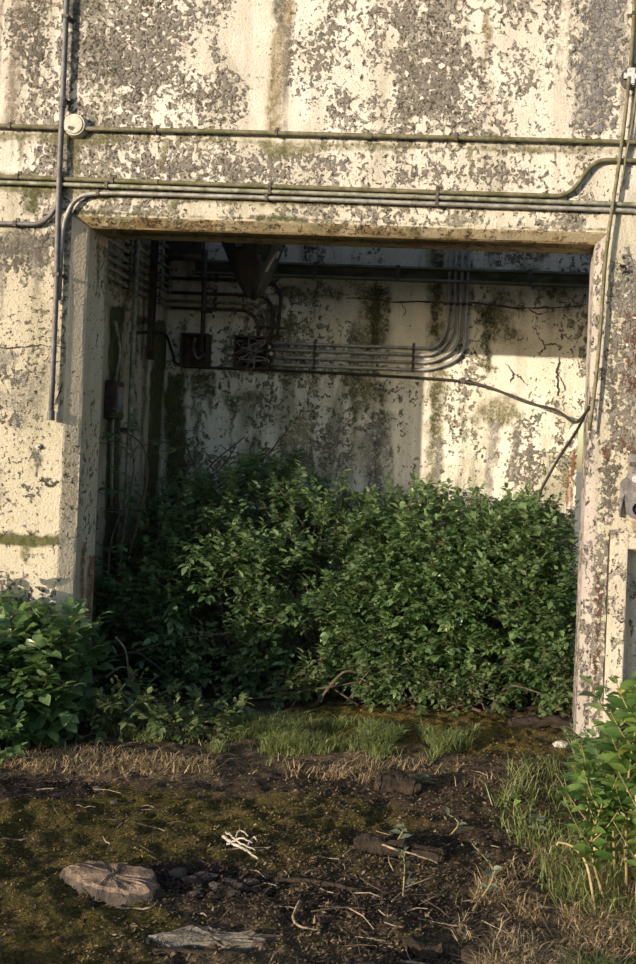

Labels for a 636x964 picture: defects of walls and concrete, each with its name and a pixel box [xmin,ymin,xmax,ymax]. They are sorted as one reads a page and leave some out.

peeling [91,0,252,126]
leakage [266,0,293,130]
peeling [304,0,491,121]
peeling [133,145,352,184]
peeling [385,159,566,190]
crack [346,297,587,396]
leakage [477,305,497,372]
peeling [0,310,62,518]
leakage [431,385,443,489]
leakage [485,424,500,499]
peeling [585,244,636,739]
leakage [0,533,59,559]